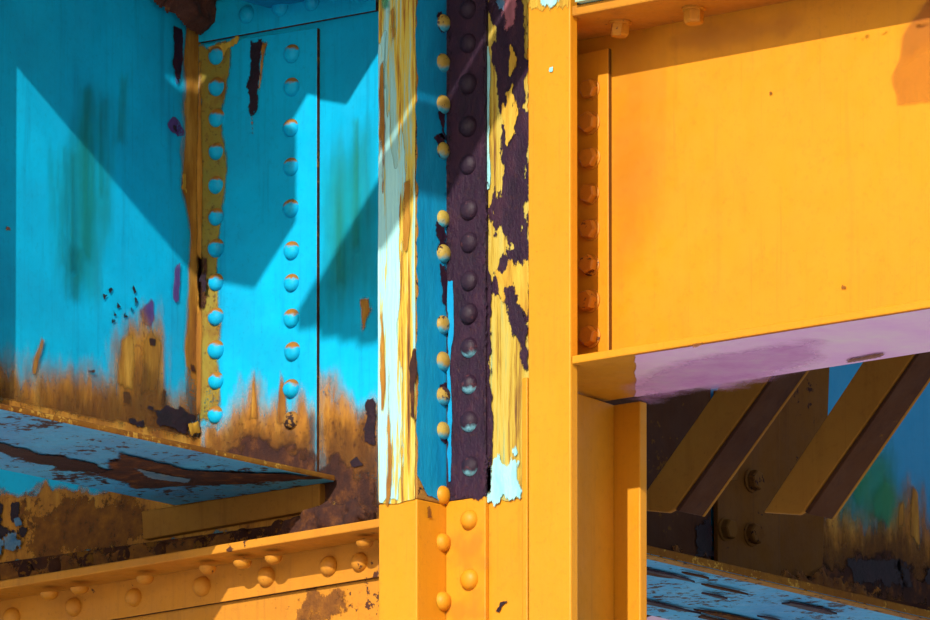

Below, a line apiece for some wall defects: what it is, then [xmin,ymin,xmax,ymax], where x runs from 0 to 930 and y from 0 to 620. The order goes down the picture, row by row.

peeling [173,26,183,84]
peeling [246,39,267,134]
peeling [378,0,417,505]
peeling [446,0,529,501]
rust [0,28,379,581]
peeling [0,443,324,489]
peeling [0,502,27,554]
rust [780,486,930,606]
rust [296,588,351,620]
peeling [647,569,749,600]
peeling [647,600,780,620]
peeling [782,601,837,615]